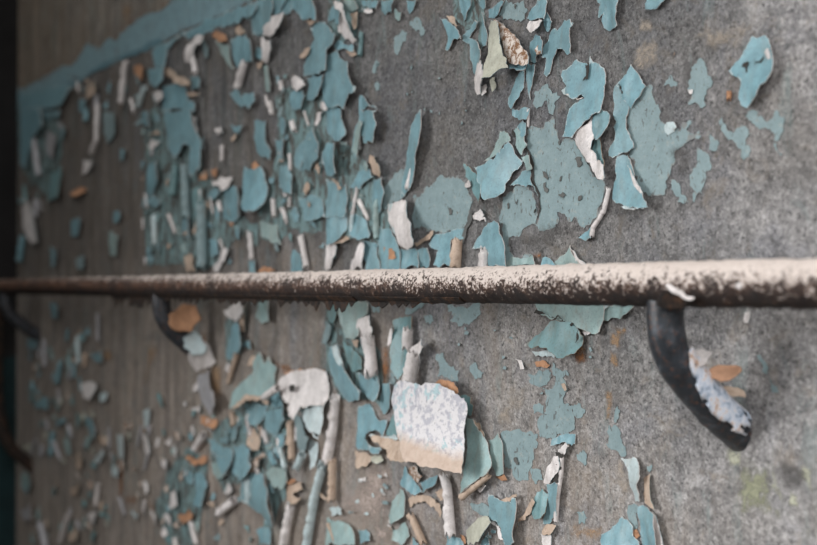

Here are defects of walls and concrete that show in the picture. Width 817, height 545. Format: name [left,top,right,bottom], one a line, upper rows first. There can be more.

peeling [645,0,664,10]
peeling [729,35,773,108]
peeling [16,0,464,273]
peeling [440,0,648,267]
peeling [664,122,676,135]
peeling [527,304,634,368]
peeling [20,300,576,545]
peeling [600,457,663,545]